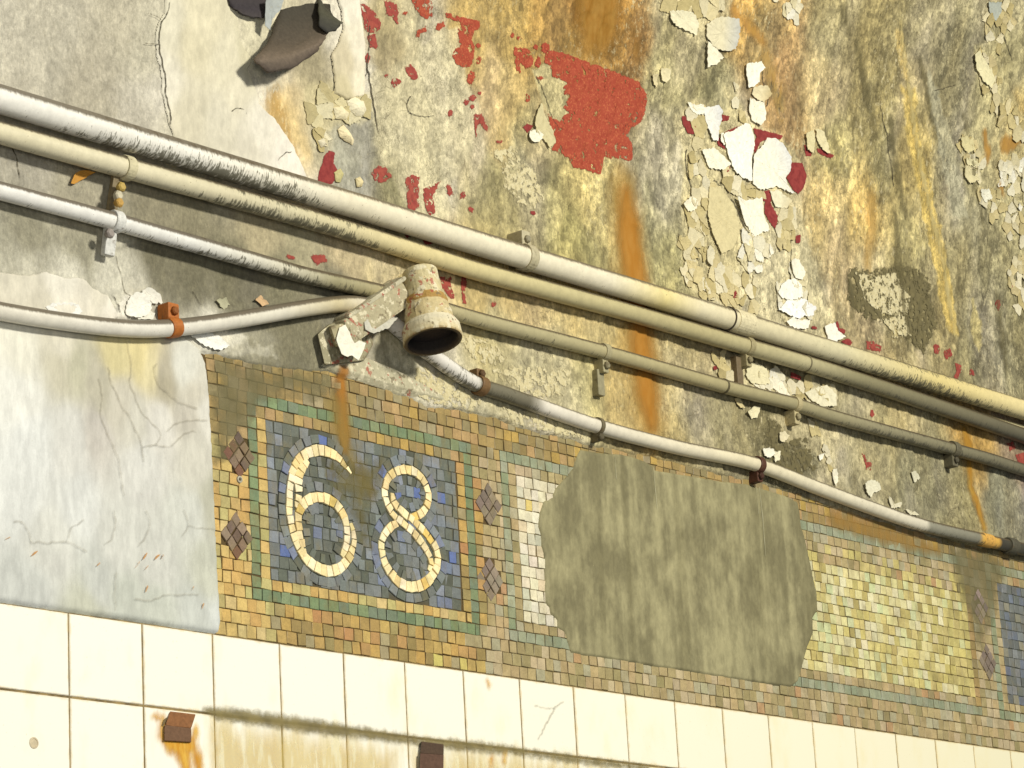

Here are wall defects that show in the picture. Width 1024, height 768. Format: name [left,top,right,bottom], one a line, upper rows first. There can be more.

crack [146,3,172,125]
peeling [155,0,488,184]
peeling [511,32,671,174]
peeling [659,0,741,68]
rust [617,179,645,281]
peeling [676,61,852,345]
peeling [956,0,1024,316]
rust [336,367,349,452]
rust [629,322,654,359]
rust [634,369,658,434]
peeling [711,349,838,407]
rust [155,715,202,768]